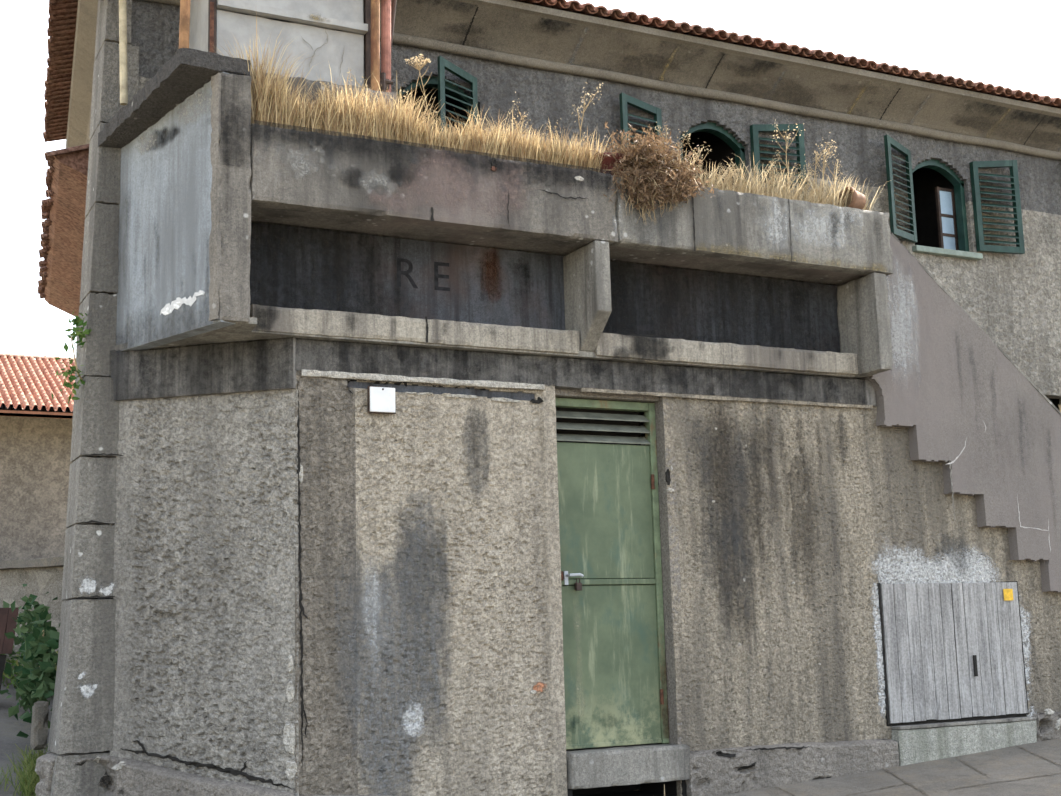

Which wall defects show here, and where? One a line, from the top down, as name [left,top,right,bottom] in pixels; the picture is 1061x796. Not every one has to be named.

crack [539,189,588,199]
peeling [160,290,205,315]
crack [947,421,986,520]
water stain [703,410,770,622]
crack [1017,495,1051,552]
water stain [339,512,448,795]
spalling [76,757,126,793]